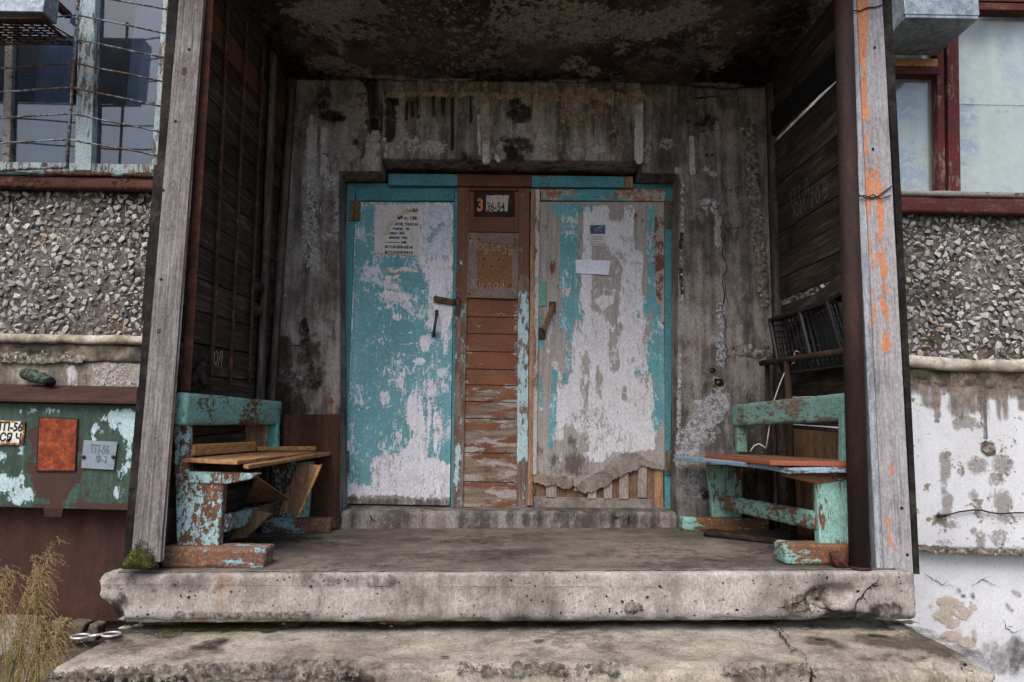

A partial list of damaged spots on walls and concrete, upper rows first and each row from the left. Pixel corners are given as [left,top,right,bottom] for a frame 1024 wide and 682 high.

leakage [316,86,346,123]
leakage [355,77,718,177]
leakage [267,318,325,446]
leakage [910,371,1024,439]
peeling [953,413,983,430]
peeling [918,440,1024,556]
crack [769,579,882,682]
peeling [929,589,978,648]